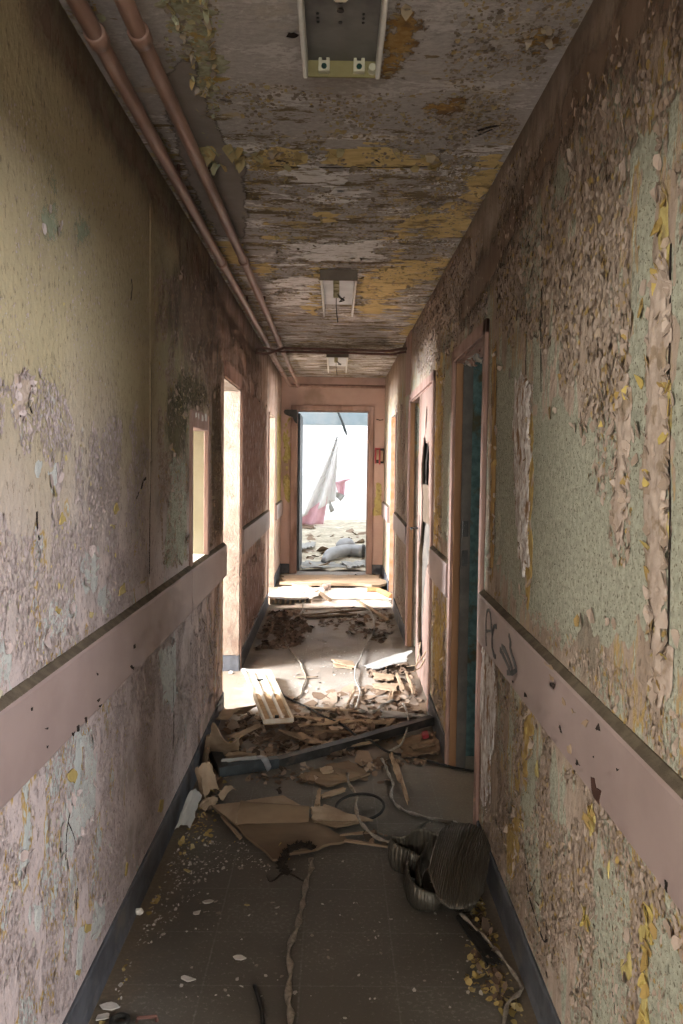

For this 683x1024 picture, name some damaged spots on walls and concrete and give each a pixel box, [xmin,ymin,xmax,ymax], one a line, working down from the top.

peeling [0,0,683,784]
peeling [0,585,221,1024]
peeling [178,764,232,859]
peeling [464,897,526,1024]
peeling [479,664,683,1024]